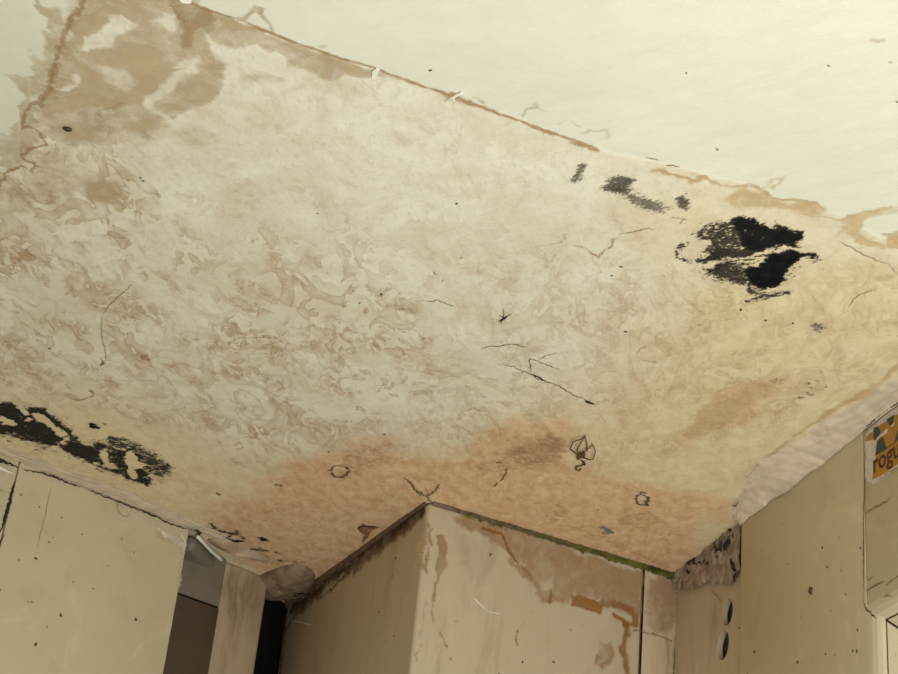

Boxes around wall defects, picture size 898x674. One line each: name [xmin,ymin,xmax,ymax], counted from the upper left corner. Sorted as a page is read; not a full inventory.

damp [24,0,263,145]
damp [281,43,369,79]
damp [599,175,690,224]
damp [655,169,712,183]
damp [675,185,823,303]
damp [842,209,898,249]
crack [483,344,595,405]
damp [0,401,178,488]
crack [0,459,202,544]
damp [209,523,303,564]
damp [686,529,737,581]
rust [462,516,642,674]